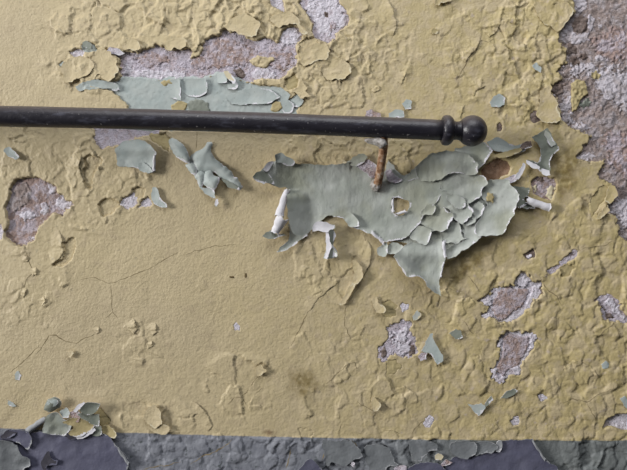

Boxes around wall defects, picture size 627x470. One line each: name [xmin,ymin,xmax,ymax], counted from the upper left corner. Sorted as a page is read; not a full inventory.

peeling [59,0,351,114]
peeling [93,128,243,207]
peeling [253,0,627,296]
flaking render [0,177,74,246]
peeling [339,260,363,305]
flaking render [372,296,443,375]
flaking render [478,272,543,384]
flaking render [594,294,627,323]
peeling [0,397,130,470]
peeling [143,405,170,435]
peeling [394,439,558,470]
flaking render [603,396,627,430]